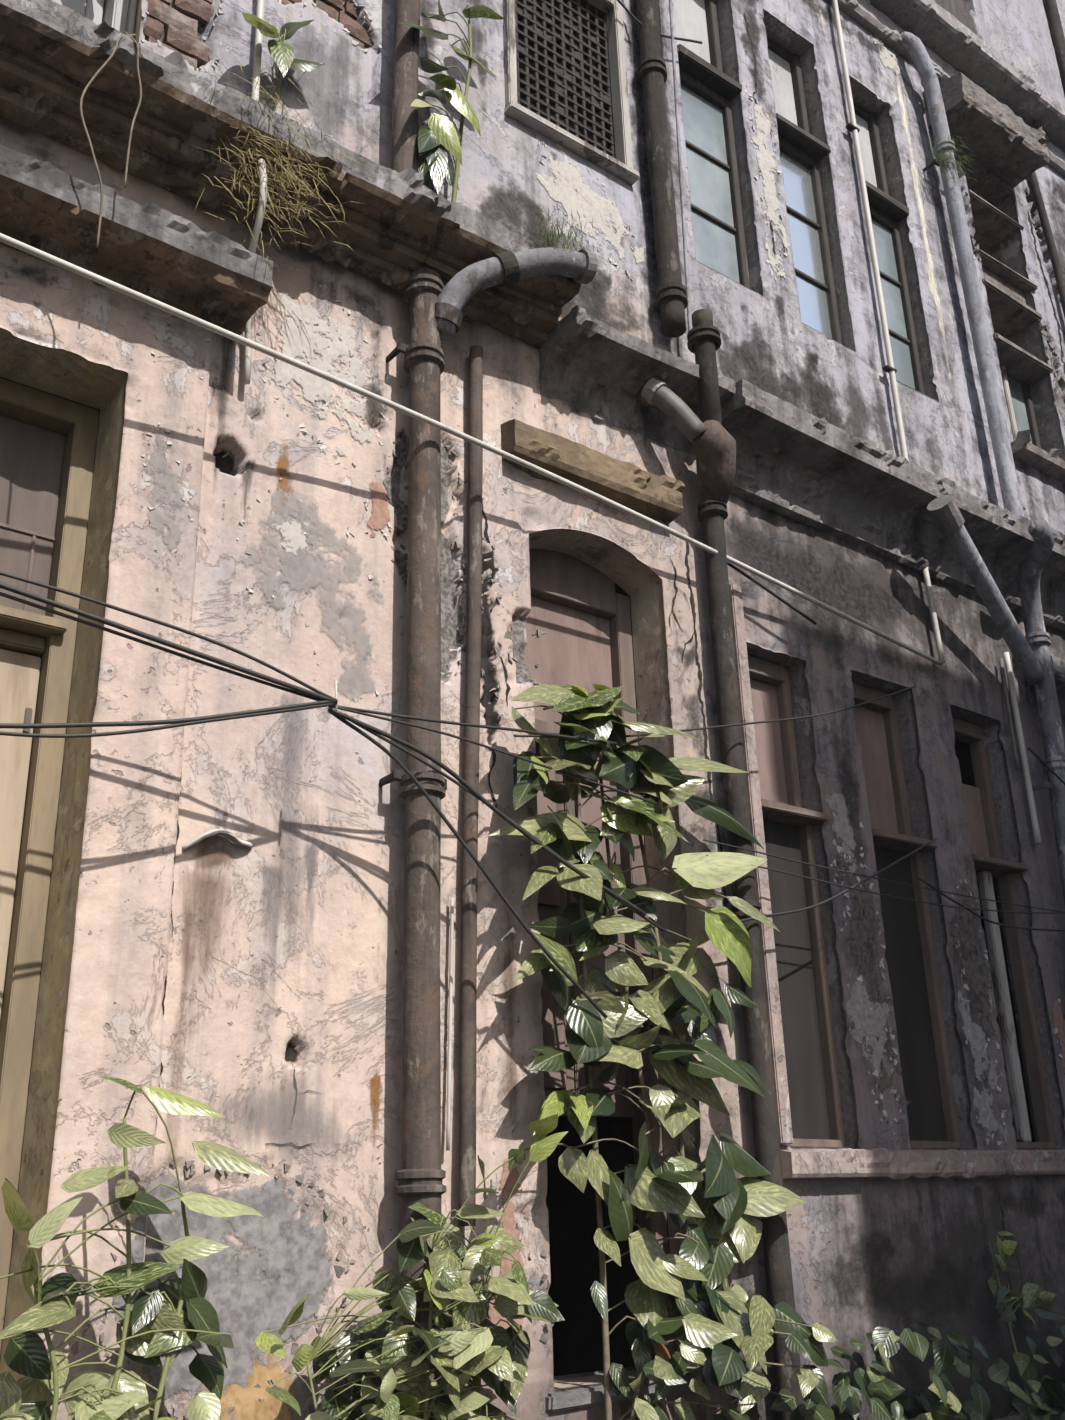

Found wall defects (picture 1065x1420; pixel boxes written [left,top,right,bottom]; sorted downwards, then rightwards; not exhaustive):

flaking render [141,0,225,71]
flaking render [278,0,383,53]
leakage [481,187,585,250]
leakage [561,271,631,332]
corrosion [277,447,291,504]
peeling [237,285,409,703]
crack [481,497,511,808]
crack [669,542,723,852]
peeling [825,793,910,1135]
corrosion [371,1075,380,1129]
peeling [957,990,1010,1145]